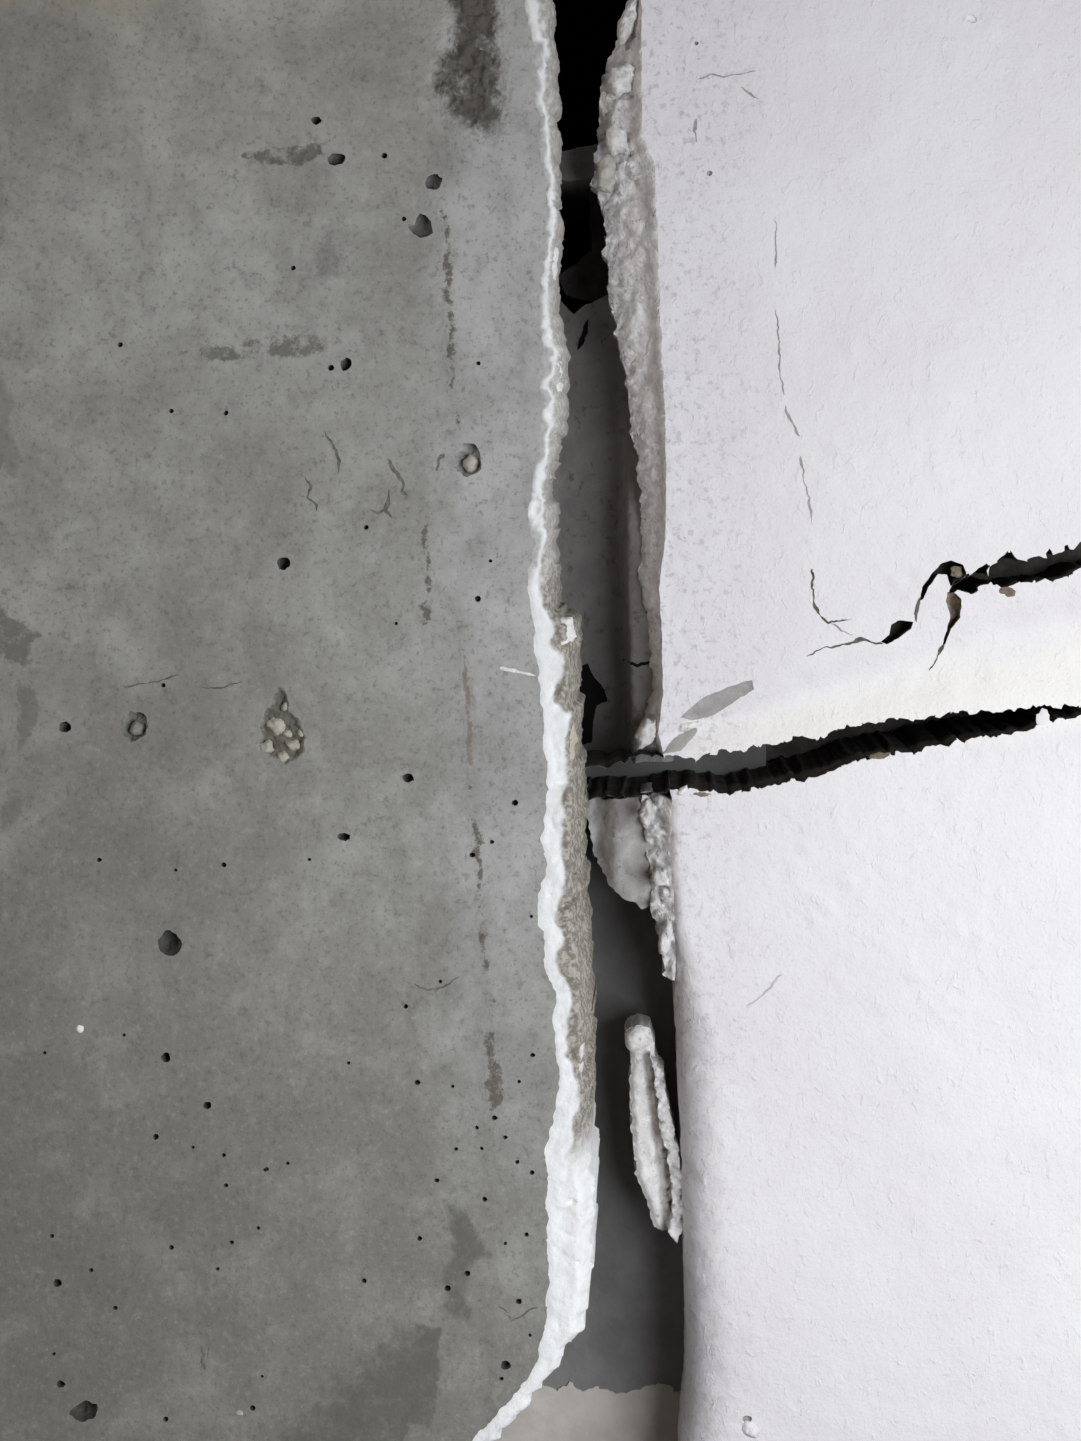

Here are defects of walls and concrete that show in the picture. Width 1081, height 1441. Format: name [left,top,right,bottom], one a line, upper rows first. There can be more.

crack [772,224,780,268]
crack [577,320,589,350]
crack [775,311,812,519]
crack [808,542,1081,670]
crack [623,659,650,667]
spalling [255,686,307,765]
spalling [419,0,684,1441]
crack [585,704,1081,800]